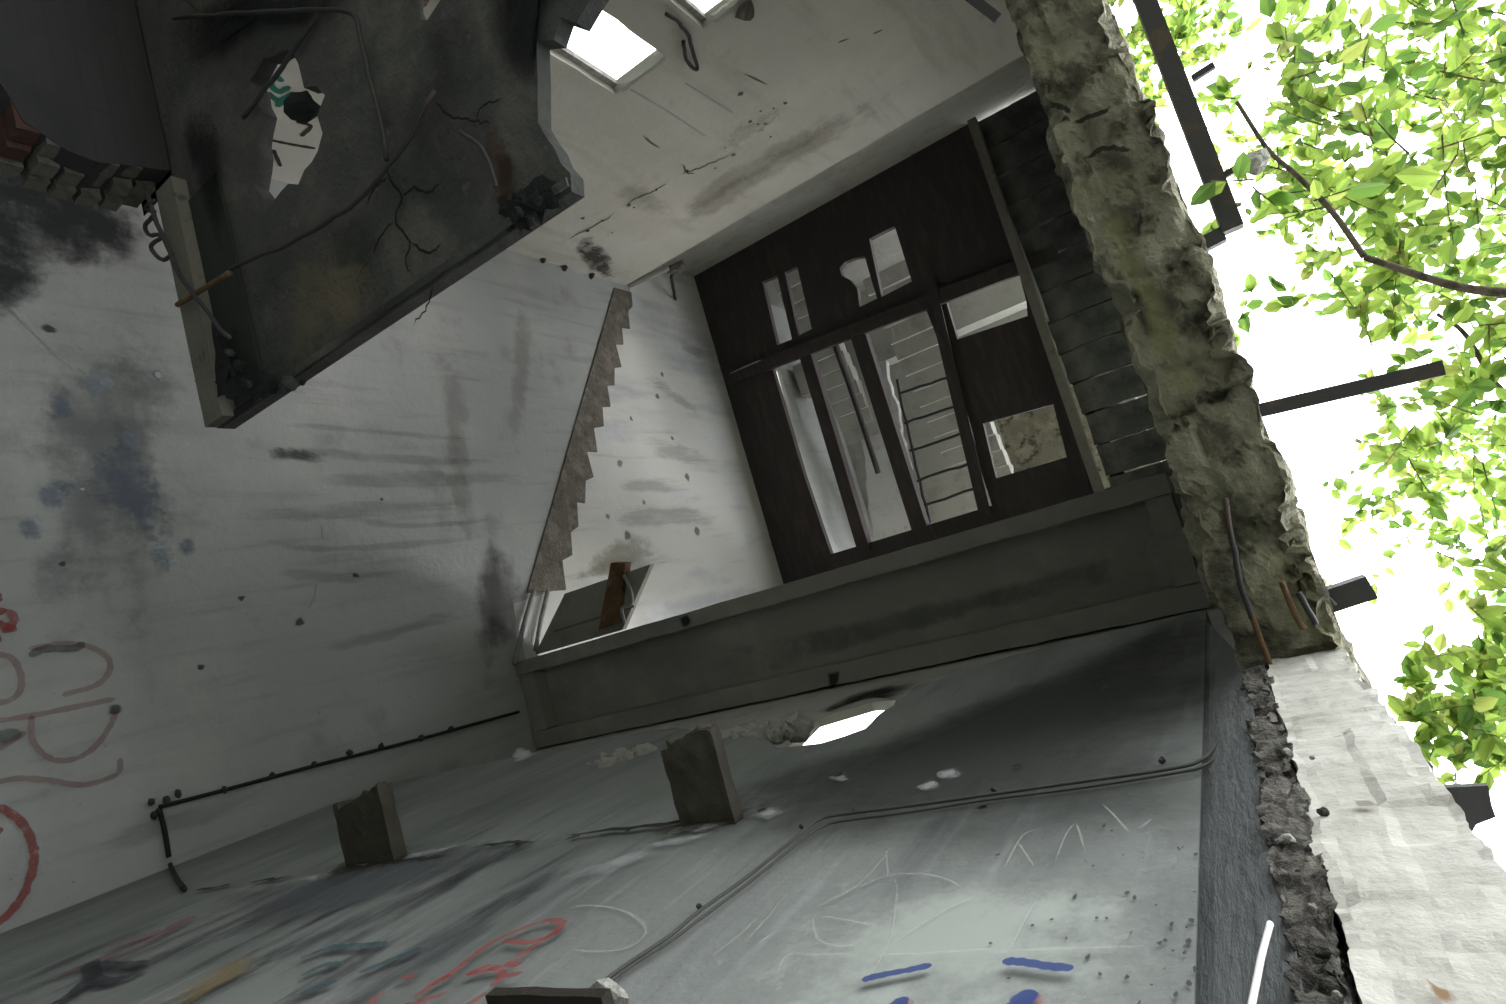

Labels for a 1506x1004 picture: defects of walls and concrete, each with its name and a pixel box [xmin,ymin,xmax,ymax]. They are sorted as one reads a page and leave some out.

crack [435,99,500,124]
crack [356,172,440,322]
rust [1223,499,1273,669]
rust [1279,581,1319,630]
spalling [1240,659,1357,1004]
spalling [1428,980,1452,1001]